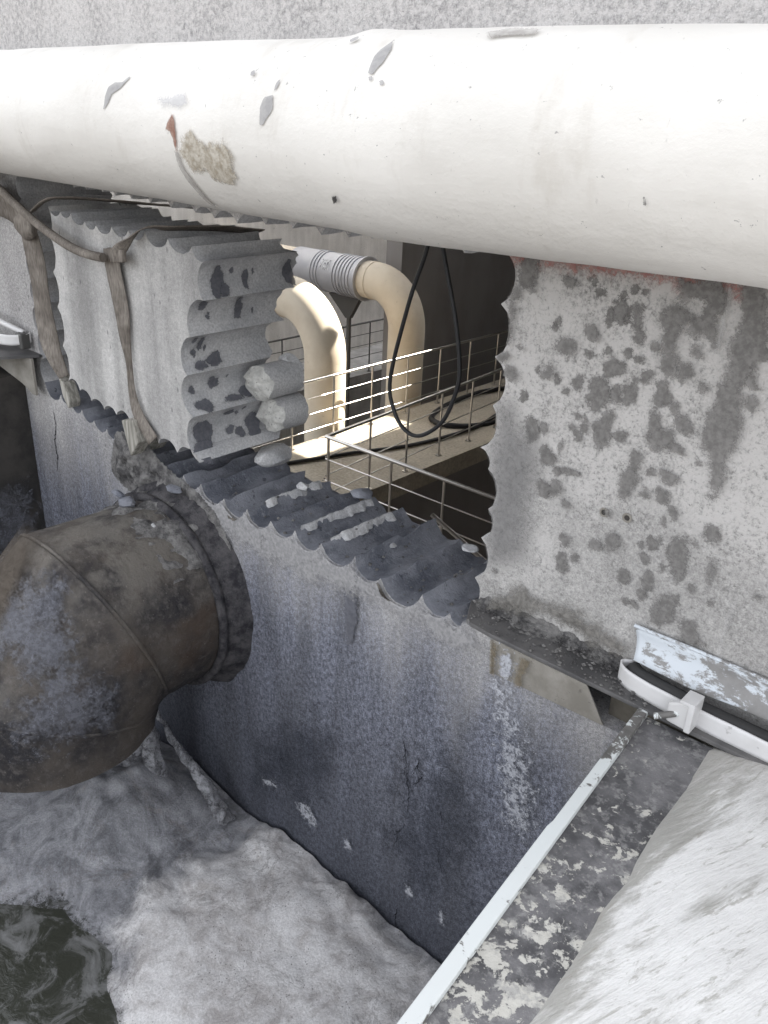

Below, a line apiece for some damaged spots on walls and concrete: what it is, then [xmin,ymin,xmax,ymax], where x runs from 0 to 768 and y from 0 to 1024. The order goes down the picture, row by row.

peeling [368,41,393,85]
peeling [103,77,130,109]
peeling [259,80,280,125]
peeling [180,130,237,185]
water stain [490,258,768,647]
spalling [264,480,323,508]
spalling [300,499,396,541]
water stain [195,487,484,650]
water stain [491,642,539,843]
crack [394,740,422,856]